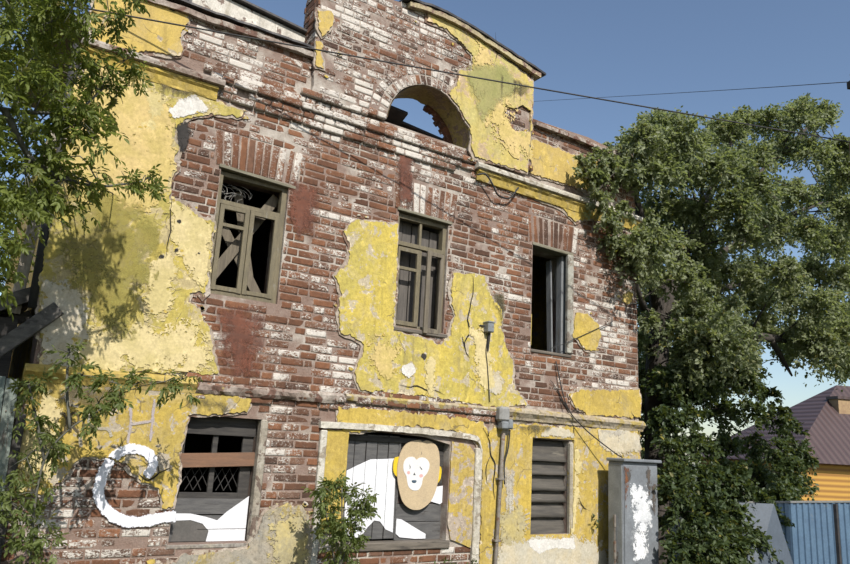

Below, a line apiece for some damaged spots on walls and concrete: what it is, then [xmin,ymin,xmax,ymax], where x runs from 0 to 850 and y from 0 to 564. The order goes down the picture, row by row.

water stain [59,193,162,340]
spalling [35,0,642,564]
crack [462,279,474,358]
spalling [1,389,178,564]
peeling [646,467,657,515]